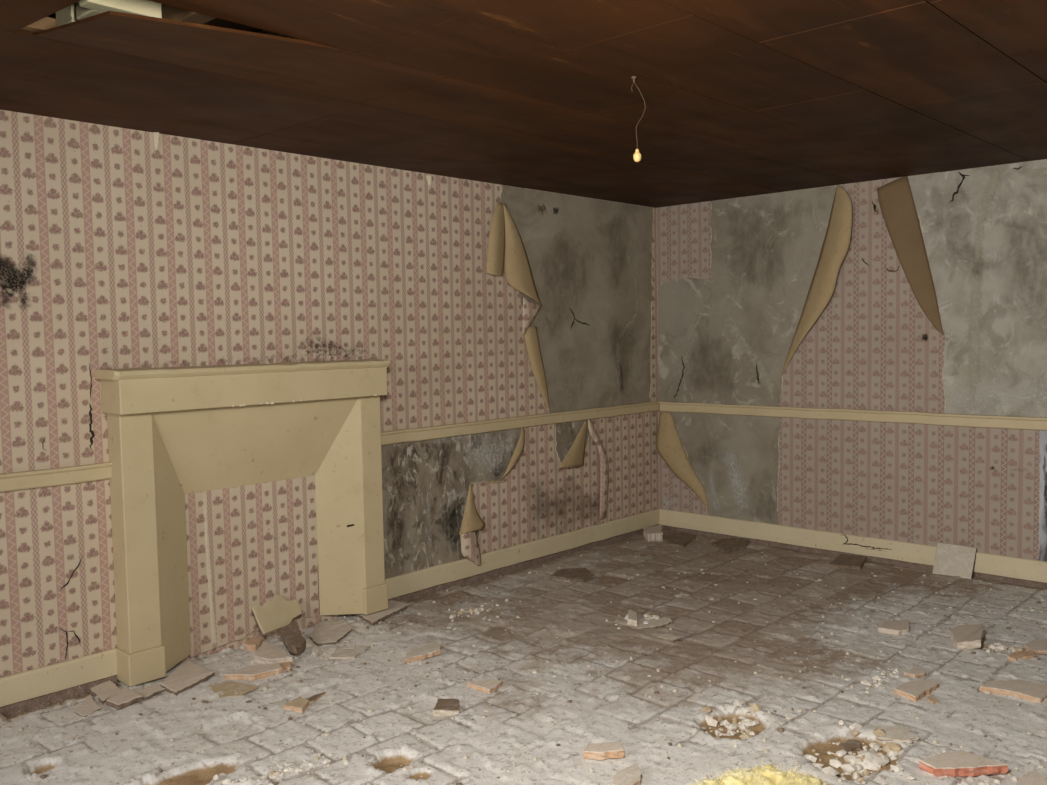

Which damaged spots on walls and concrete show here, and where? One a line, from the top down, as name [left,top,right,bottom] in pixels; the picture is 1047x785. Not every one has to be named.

damp [0,257,33,306]
flaking render [499,185,842,524]
crack [950,172,970,202]
flaking render [908,159,1047,418]